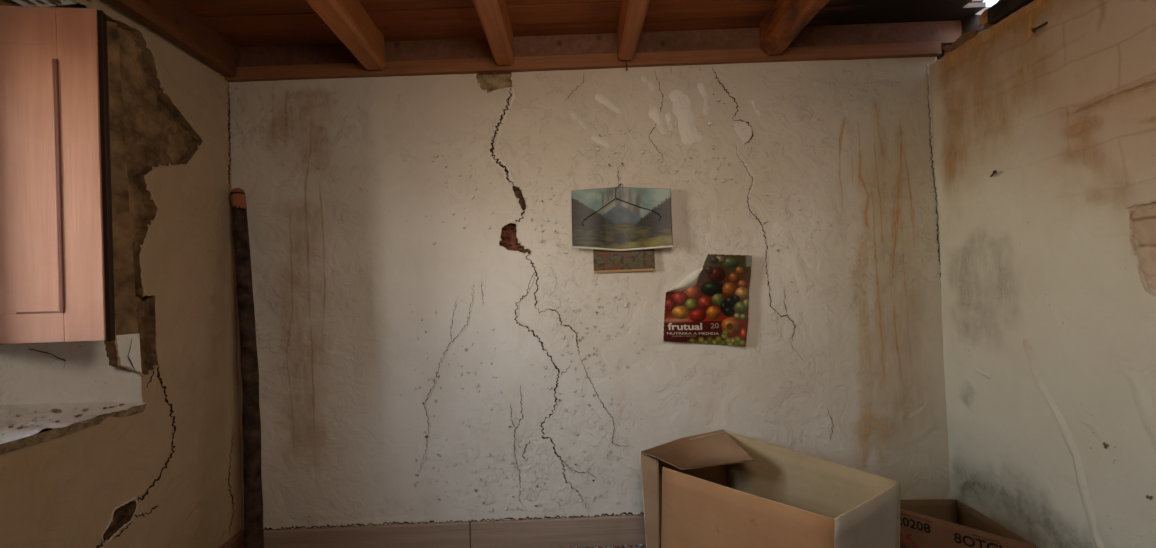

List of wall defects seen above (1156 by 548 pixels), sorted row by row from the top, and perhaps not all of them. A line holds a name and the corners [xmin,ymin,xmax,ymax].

spalling [104,12,204,377]
crack [489,88,525,222]
spalling [487,185,567,256]
crack [649,77,664,162]
crack [712,66,806,362]
peeling [1129,203,1156,297]
crack [96,340,176,548]
crack [227,441,235,535]
crack [263,254,644,530]